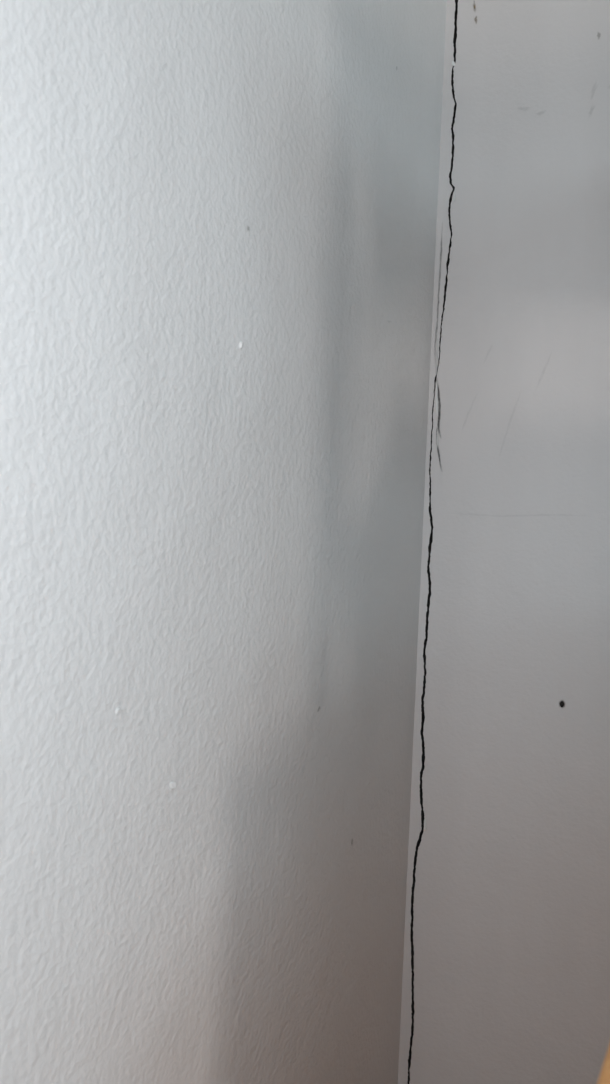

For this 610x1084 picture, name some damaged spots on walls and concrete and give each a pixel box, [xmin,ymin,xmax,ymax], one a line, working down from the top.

crack [407,0,458,1084]